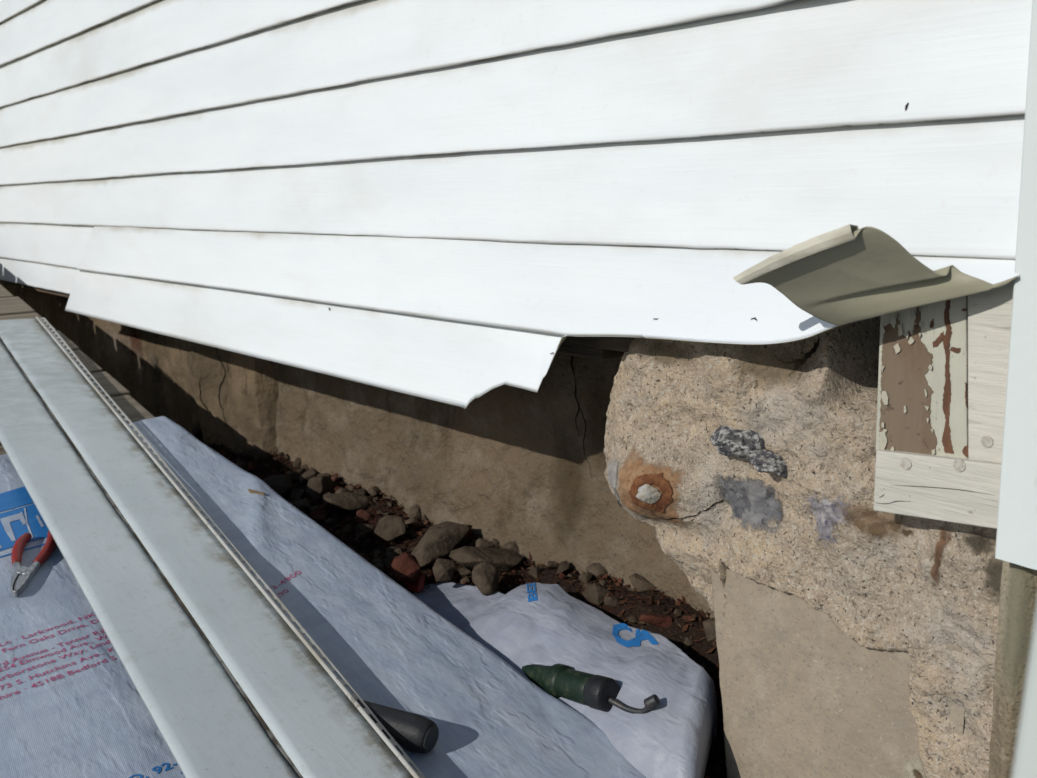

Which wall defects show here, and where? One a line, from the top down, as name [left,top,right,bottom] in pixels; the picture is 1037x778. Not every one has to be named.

crack [199,350,227,425]
crack [570,355,591,475]
peeling [879,299,968,457]
corrosion [618,453,683,524]
crack [642,493,725,520]